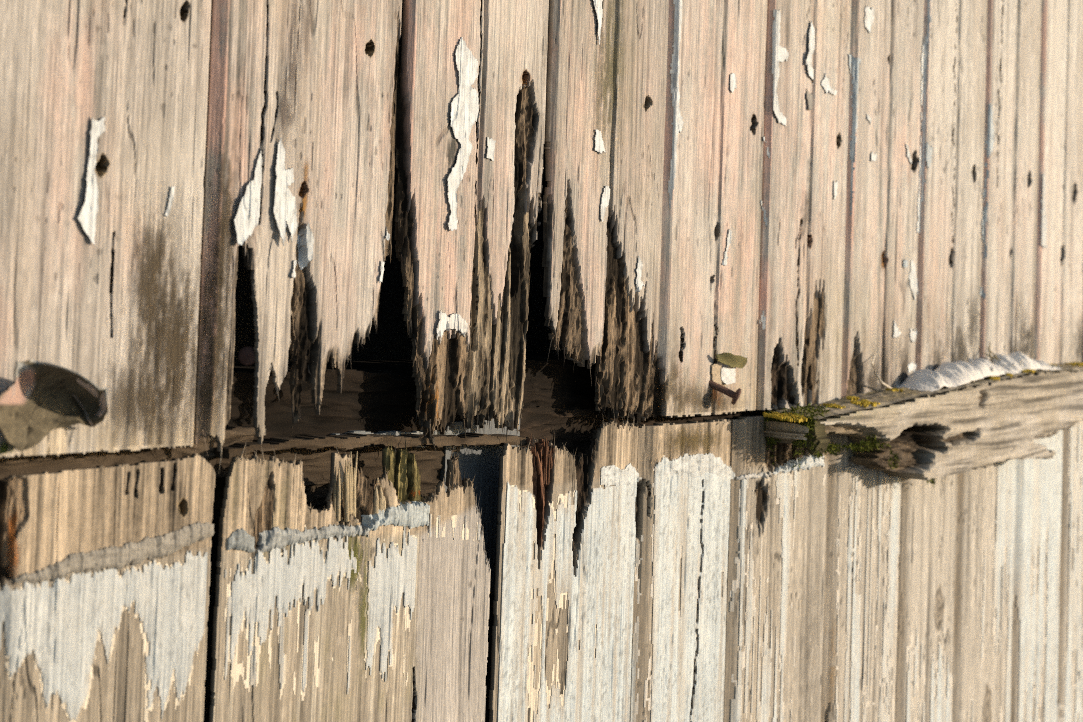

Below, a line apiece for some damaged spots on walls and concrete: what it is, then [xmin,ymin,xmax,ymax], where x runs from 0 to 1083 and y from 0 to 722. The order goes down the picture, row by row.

peeling [234,144,263,245]
peeling [273,138,314,278]
peeling [447,37,481,231]
peeling [771,9,789,126]
peeling [833,54,872,215]
peeling [905,0,933,233]
peeling [0,360,108,451]
damp [116,229,226,434]
peeling [436,310,468,340]
peeling [0,522,214,722]
peeling [223,501,481,701]
peeling [497,453,826,722]